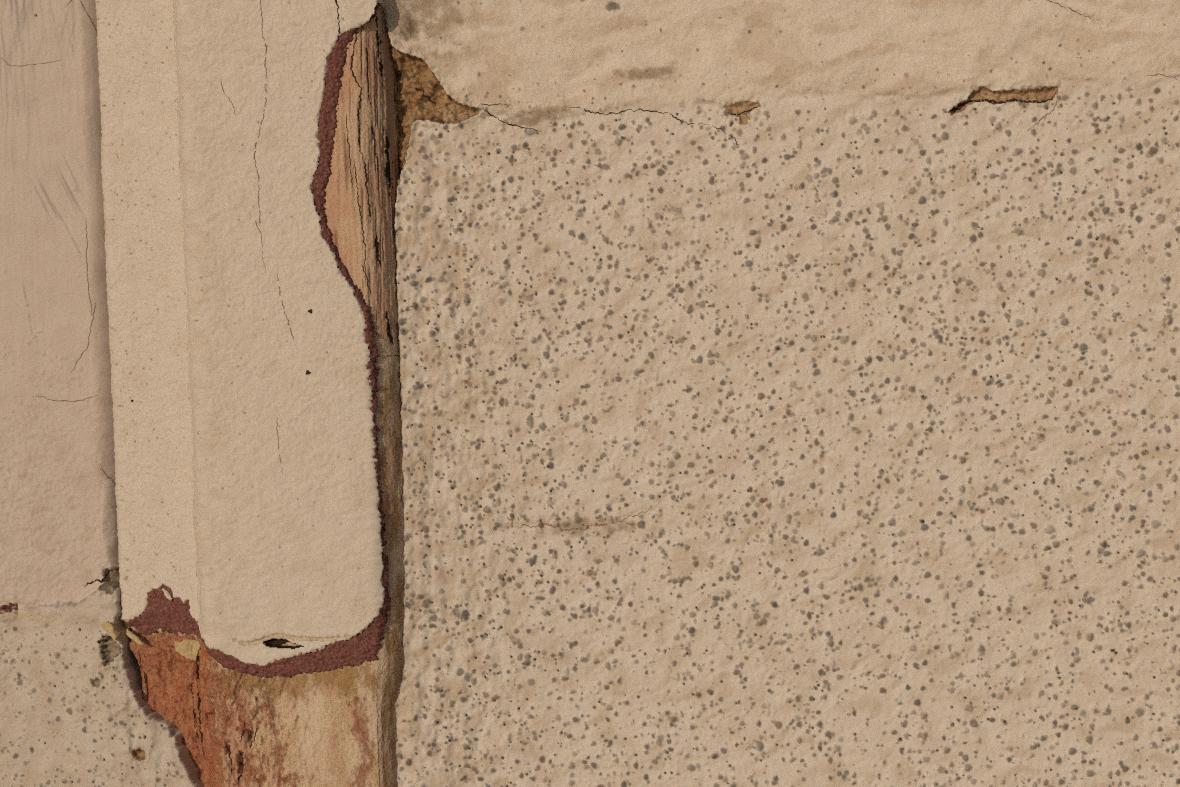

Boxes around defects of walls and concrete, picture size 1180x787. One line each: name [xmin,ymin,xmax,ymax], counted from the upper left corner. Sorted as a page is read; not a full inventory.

crack [482,103,539,132]
spalling [724,101,761,125]
spalling [947,85,1058,115]
spalling [90,3,482,688]
spalling [0,602,18,614]
spalling [132,749,145,761]